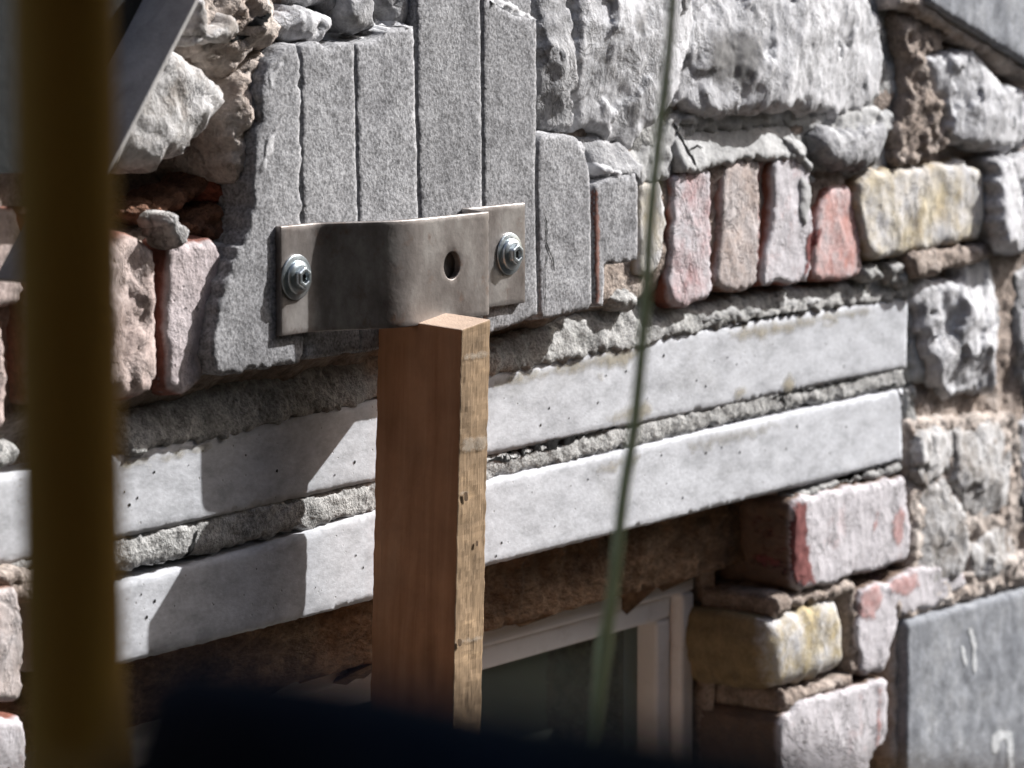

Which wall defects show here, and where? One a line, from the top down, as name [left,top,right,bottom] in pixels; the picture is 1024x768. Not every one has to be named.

crack [673,122,703,166]